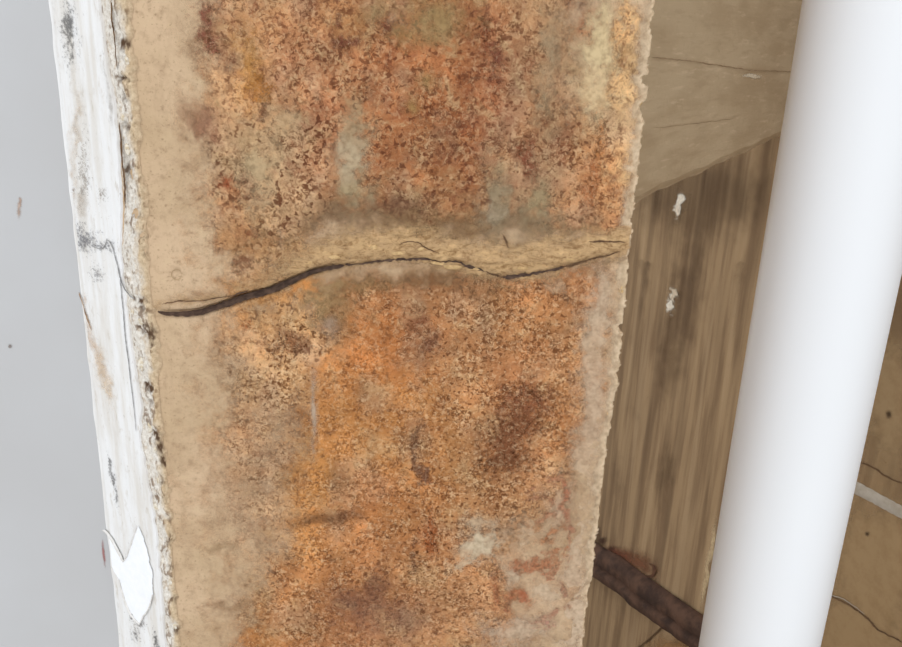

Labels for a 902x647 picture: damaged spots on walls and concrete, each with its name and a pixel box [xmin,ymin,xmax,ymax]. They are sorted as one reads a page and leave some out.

spalling [101,0,182,647]
crack [158,240,626,317]
rust [192,0,642,647]
water stain [478,384,552,477]
water stain [574,283,609,486]
water stain [456,518,491,569]
water stain [535,526,584,644]